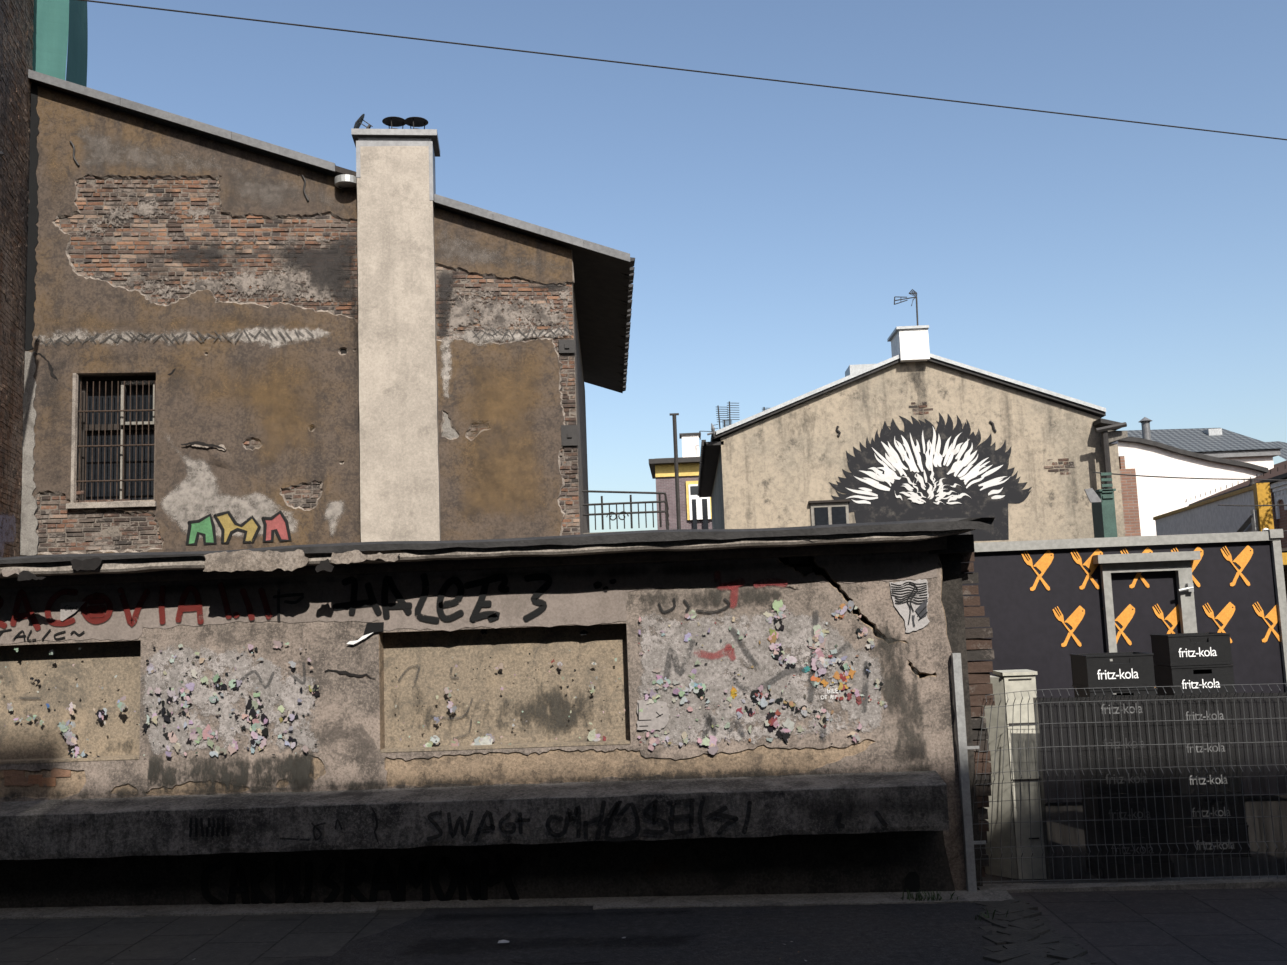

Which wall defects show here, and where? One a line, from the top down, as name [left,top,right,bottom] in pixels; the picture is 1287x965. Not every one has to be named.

flaking render [55,175,358,322]
peeling [34,327,328,348]
flaking render [435,264,576,440]
flaking render [558,446,580,536]
crack [779,538,934,678]